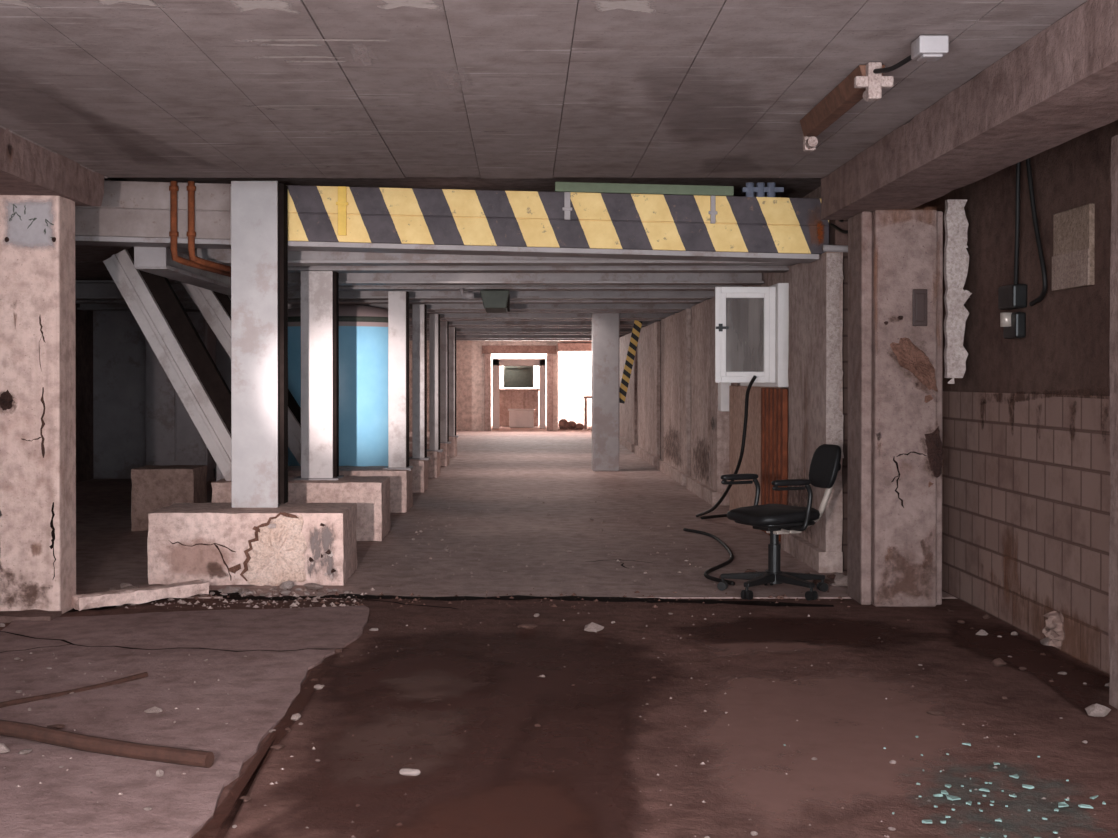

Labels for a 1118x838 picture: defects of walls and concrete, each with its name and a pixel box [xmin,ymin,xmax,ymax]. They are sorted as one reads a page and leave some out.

peeling [890,200,972,403]
crack [0,541,834,653]